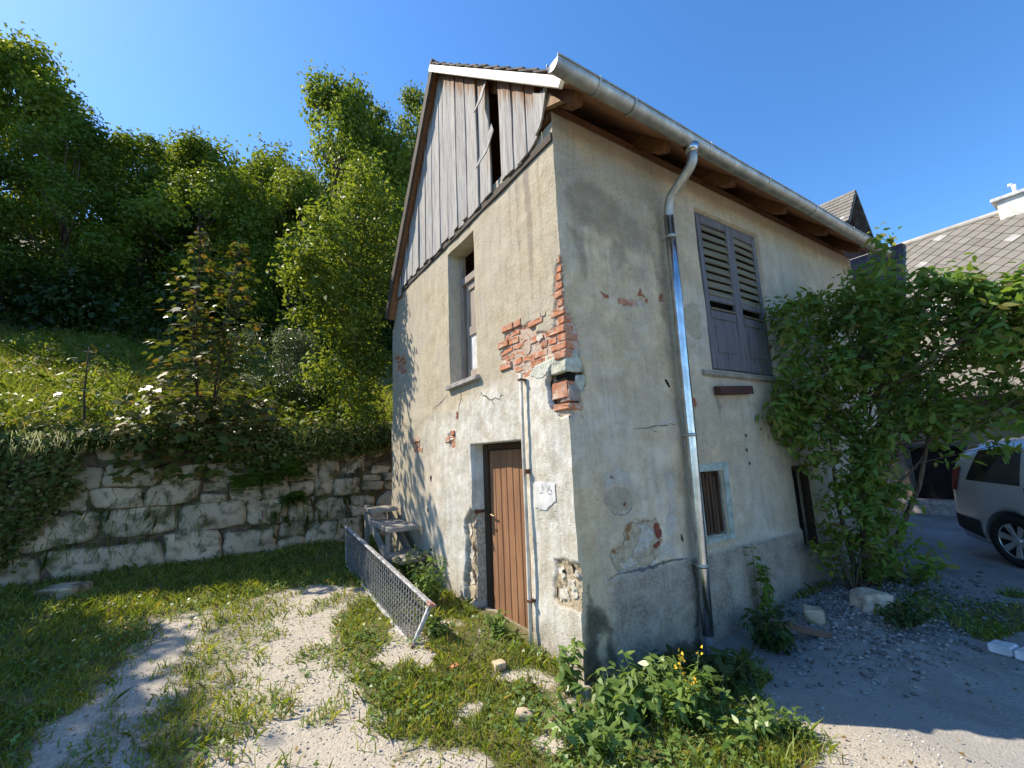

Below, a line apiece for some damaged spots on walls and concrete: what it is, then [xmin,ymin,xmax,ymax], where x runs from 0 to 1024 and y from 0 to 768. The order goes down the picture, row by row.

spalling [600,289,663,307]
spalling [498,256,585,419]
spalling [445,430,457,448]
spalling [467,513,478,601]
flaking render [556,560,583,611]
spalling [604,468,687,580]
water stain [584,608,616,684]